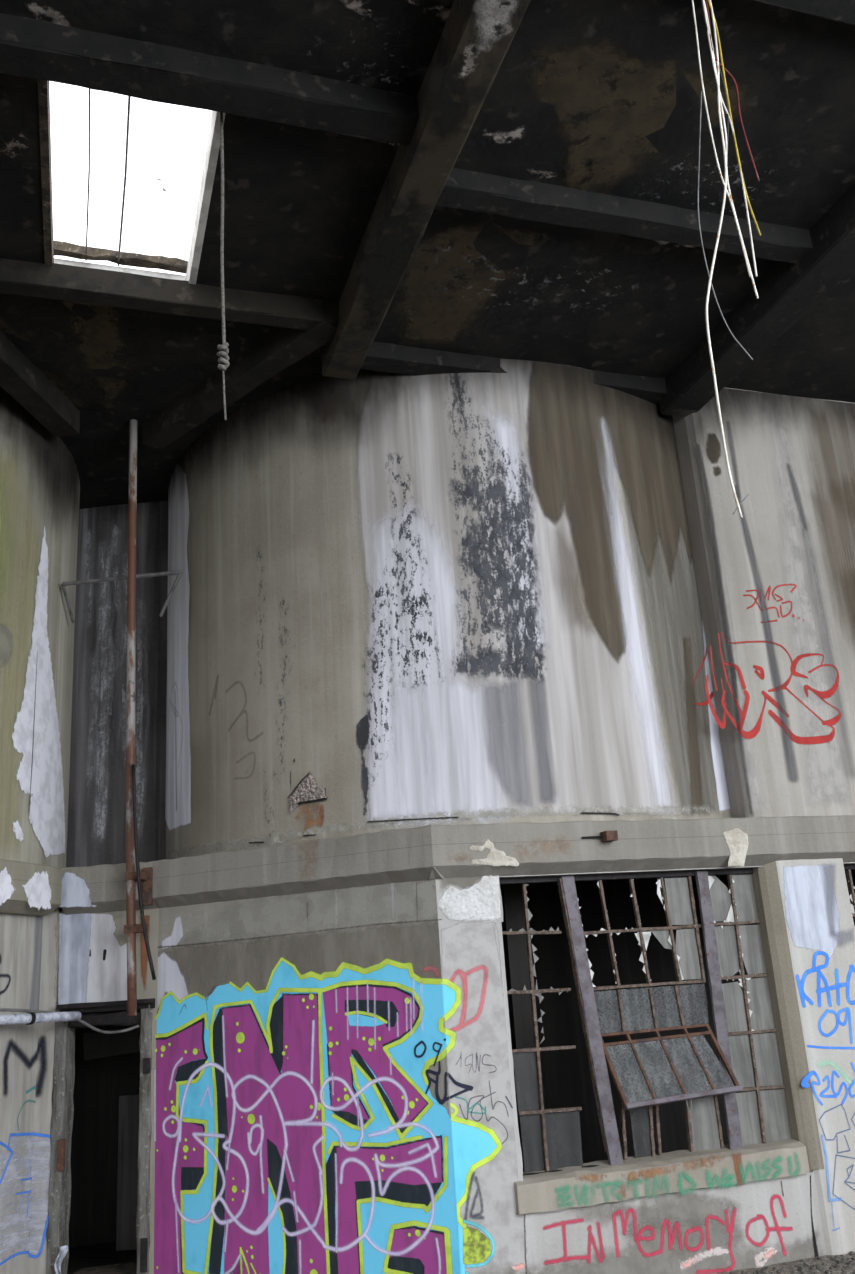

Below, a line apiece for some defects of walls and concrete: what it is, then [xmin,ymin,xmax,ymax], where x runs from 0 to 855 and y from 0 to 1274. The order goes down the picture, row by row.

peeling [486,129,523,142]
leakage [534,42,750,192]
leakage [397,223,636,345]
leakage [12,526,65,857]
leakage [85,527,144,838]
leakage [170,364,730,857]
peeling [723,828,749,867]
corrosion [140,916,149,986]
peeling [0,866,127,1274]
peeling [438,839,527,1274]
peeling [680,1247,729,1270]
peeling [755,1247,777,1268]